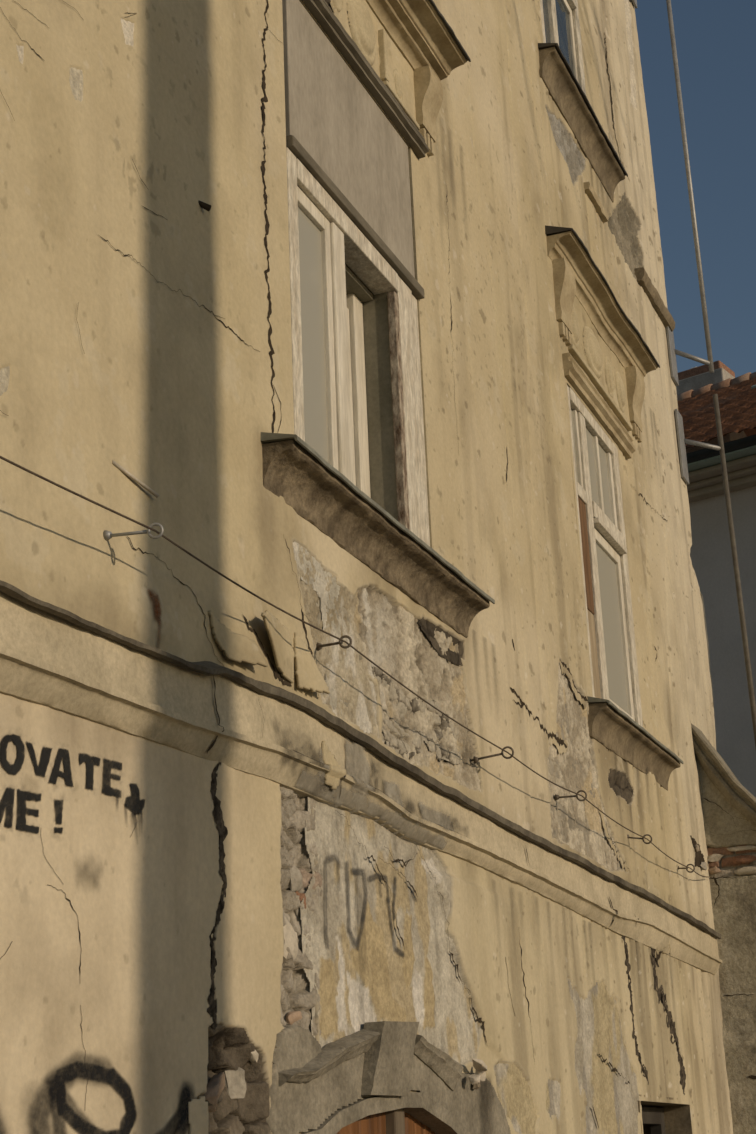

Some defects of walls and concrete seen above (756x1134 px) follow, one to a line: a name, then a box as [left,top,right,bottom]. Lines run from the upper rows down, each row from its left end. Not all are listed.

spalling [545,107,585,183]
crack [99,0,282,433]
spalling [608,193,643,286]
crack [511,686,567,755]
crack [127,536,228,1030]
peeling [280,542,561,1134]
spalling [691,836,756,878]
crack [598,897,686,1089]
spalling [197,1025,270,1134]